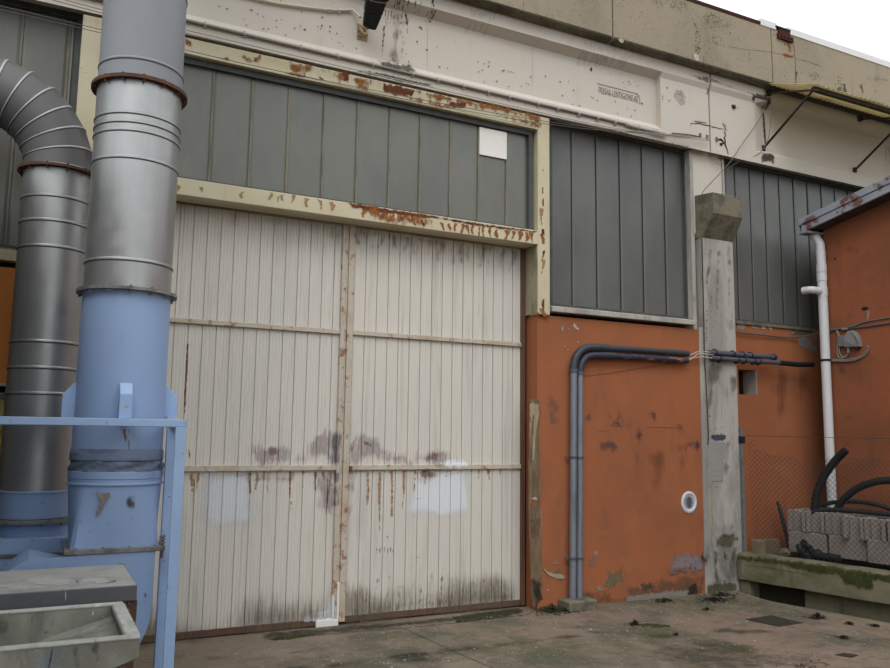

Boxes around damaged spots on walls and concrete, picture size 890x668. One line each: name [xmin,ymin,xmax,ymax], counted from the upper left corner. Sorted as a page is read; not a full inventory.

corrosion [288,64,541,127]
corrosion [268,193,335,211]
corrosion [350,187,545,273]
corrosion [366,470,426,530]
flaking render [528,399,549,607]
peeling [670,553,705,576]